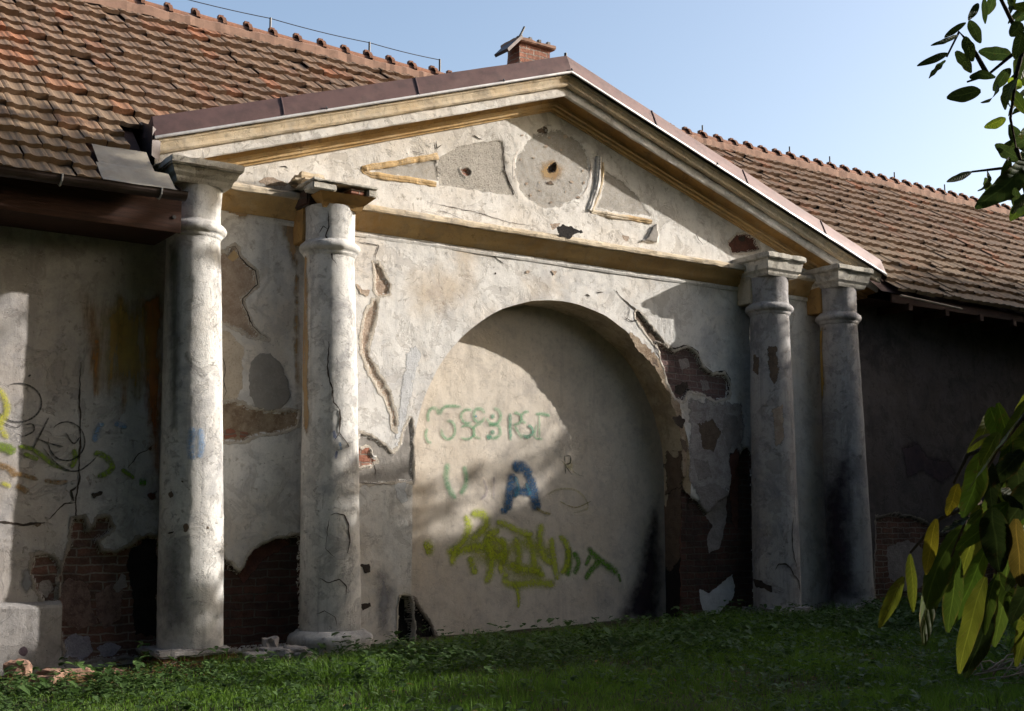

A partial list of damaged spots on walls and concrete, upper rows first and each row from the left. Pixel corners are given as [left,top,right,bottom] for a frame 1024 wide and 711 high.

flaking render [436,135,516,195]
spalling [727,231,761,255]
crack [51,368,103,520]
flaking render [220,243,302,445]
crack [327,341,349,447]
spalling [356,241,416,487]
crack [616,291,731,395]
spalling [630,332,753,617]
spalling [22,514,189,666]
spalling [223,532,300,653]
crack [320,513,350,594]
damp [623,517,658,619]